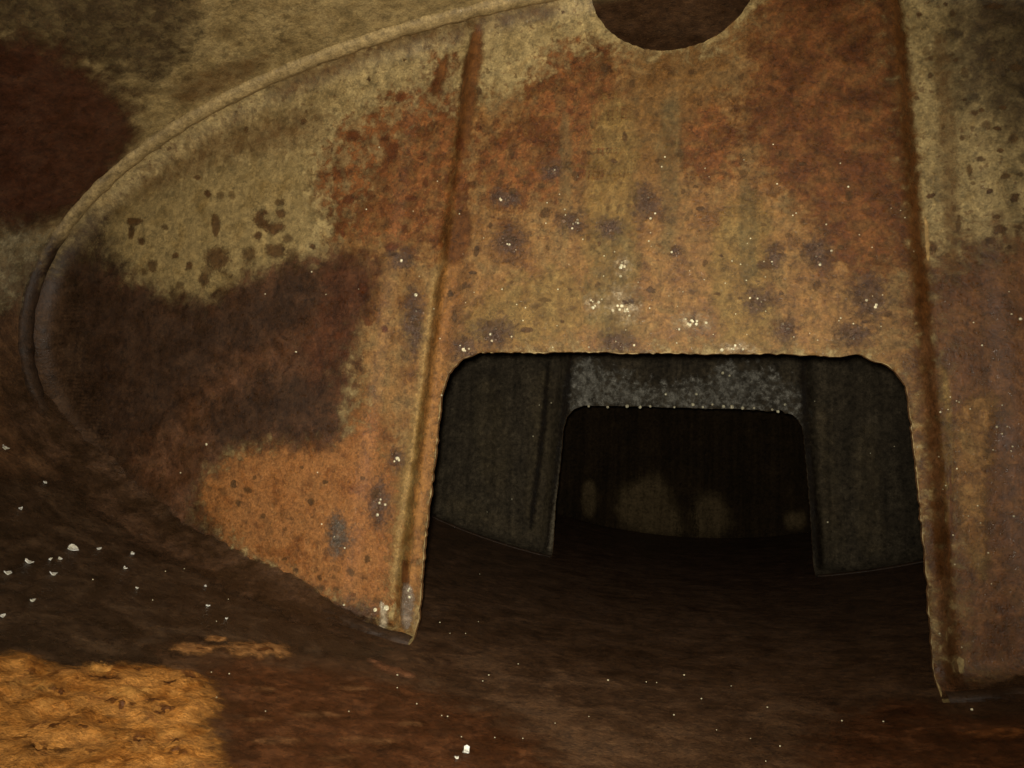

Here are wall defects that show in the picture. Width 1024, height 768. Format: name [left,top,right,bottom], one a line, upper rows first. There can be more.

corrosion [327,514,348,554]
corrosion [933,650,967,696]